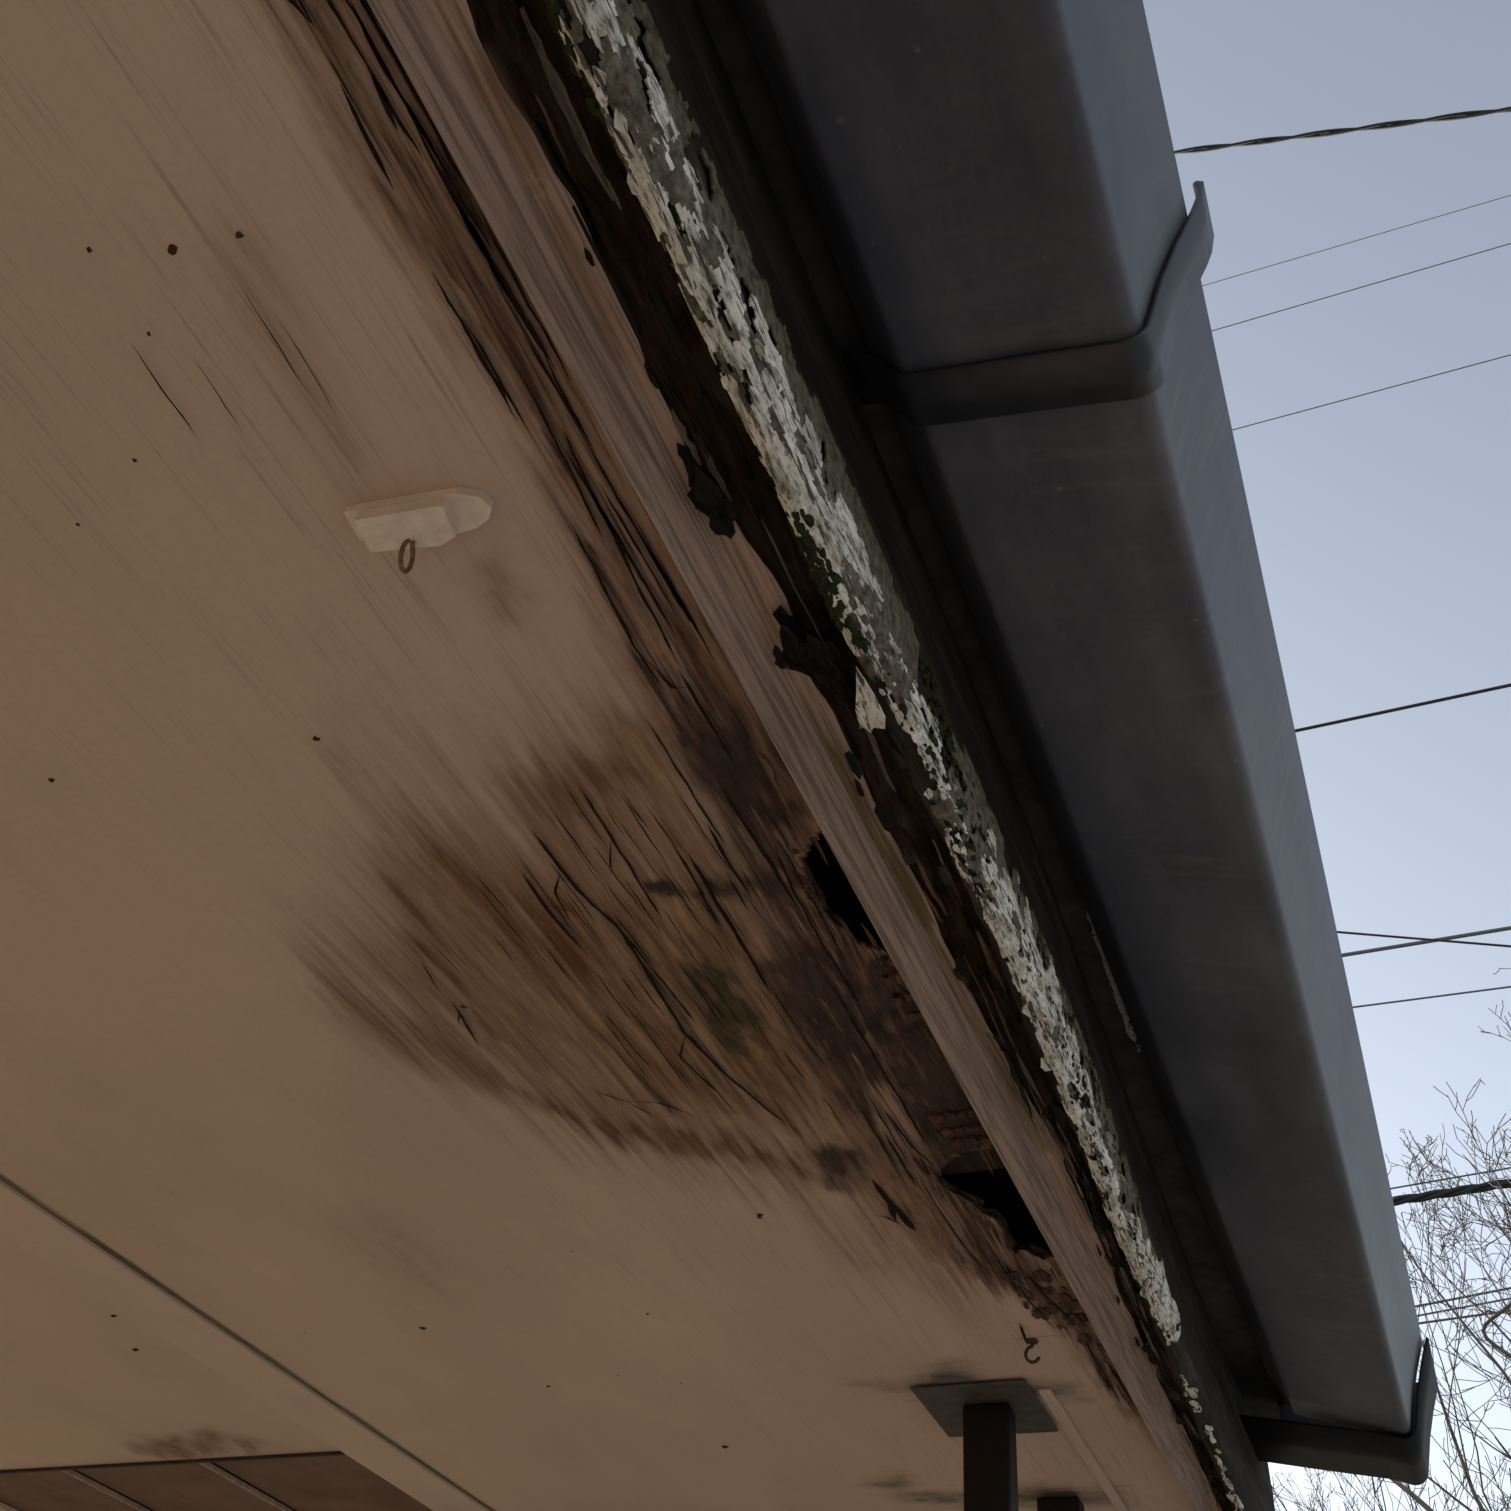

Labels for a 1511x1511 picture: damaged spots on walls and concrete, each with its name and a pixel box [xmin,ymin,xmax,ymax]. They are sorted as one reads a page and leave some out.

water stain [349,686,993,1287]
crack [288,0,1133,1403]
peeling [558,0,1244,1511]